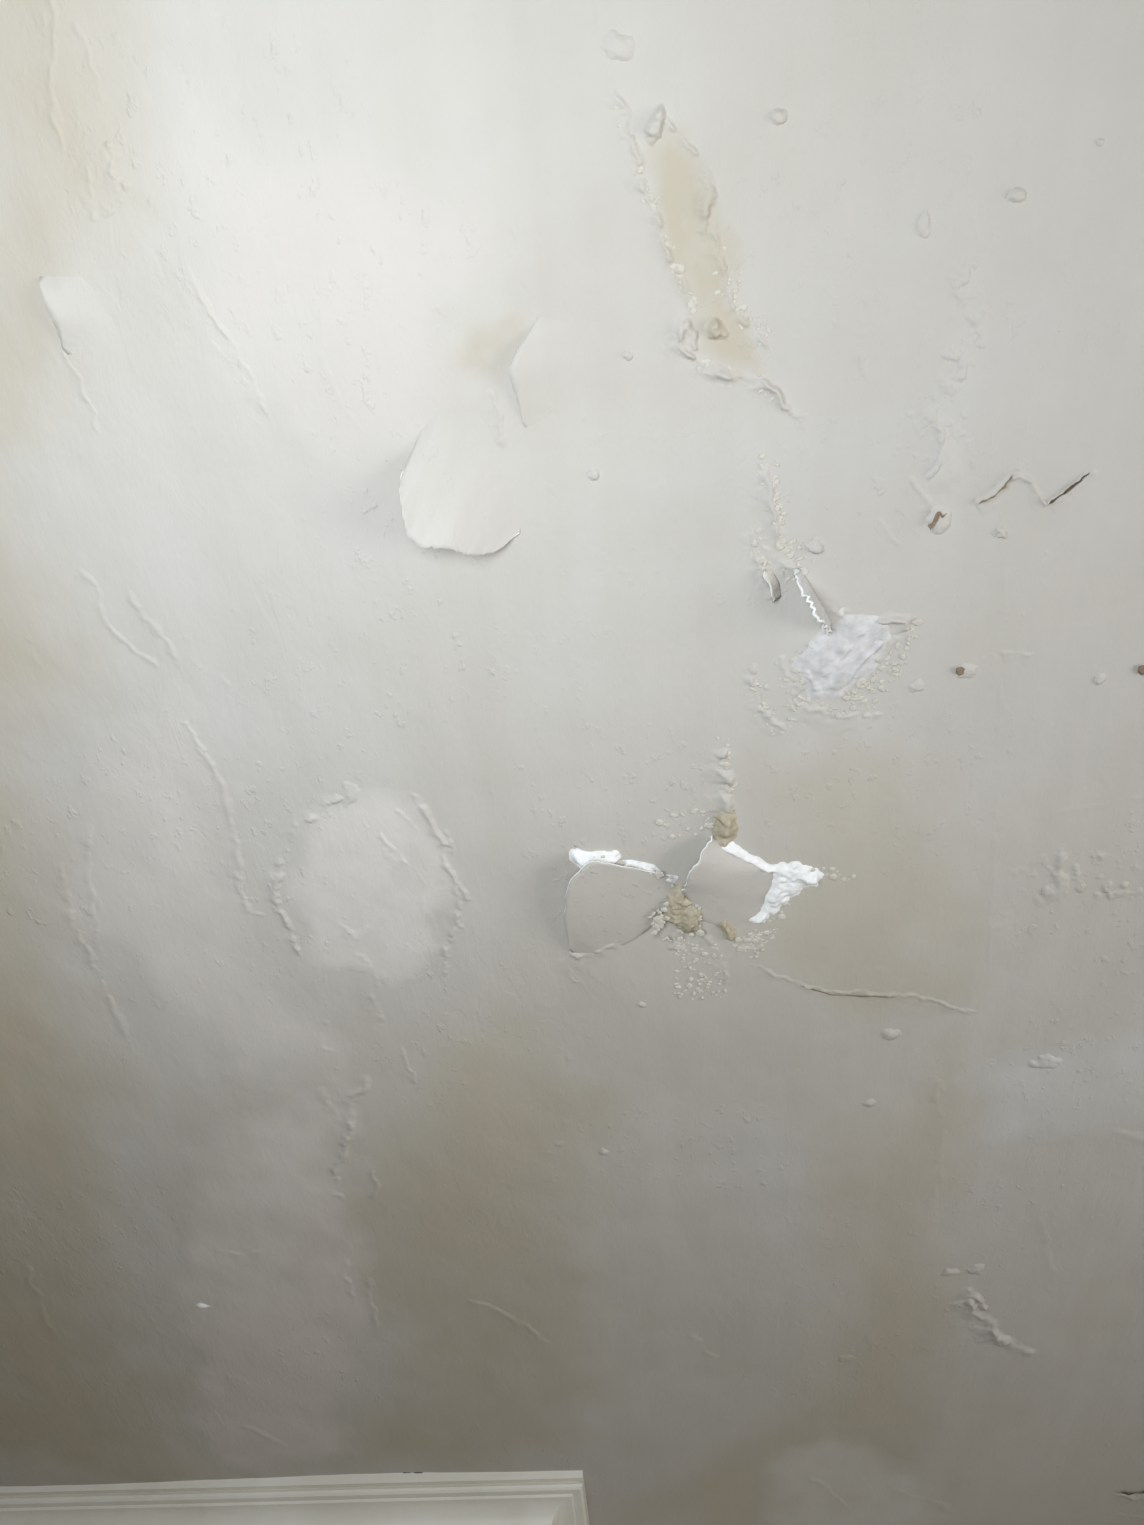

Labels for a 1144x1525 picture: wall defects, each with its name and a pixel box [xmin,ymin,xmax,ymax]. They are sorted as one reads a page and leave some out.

peeling [38,276,107,437]
peeling [399,408,521,556]
spalling [738,453,925,740]
spalling [552,737,856,1000]
peeling [941,1263,1039,1367]
crack [1108,1491,1144,1506]